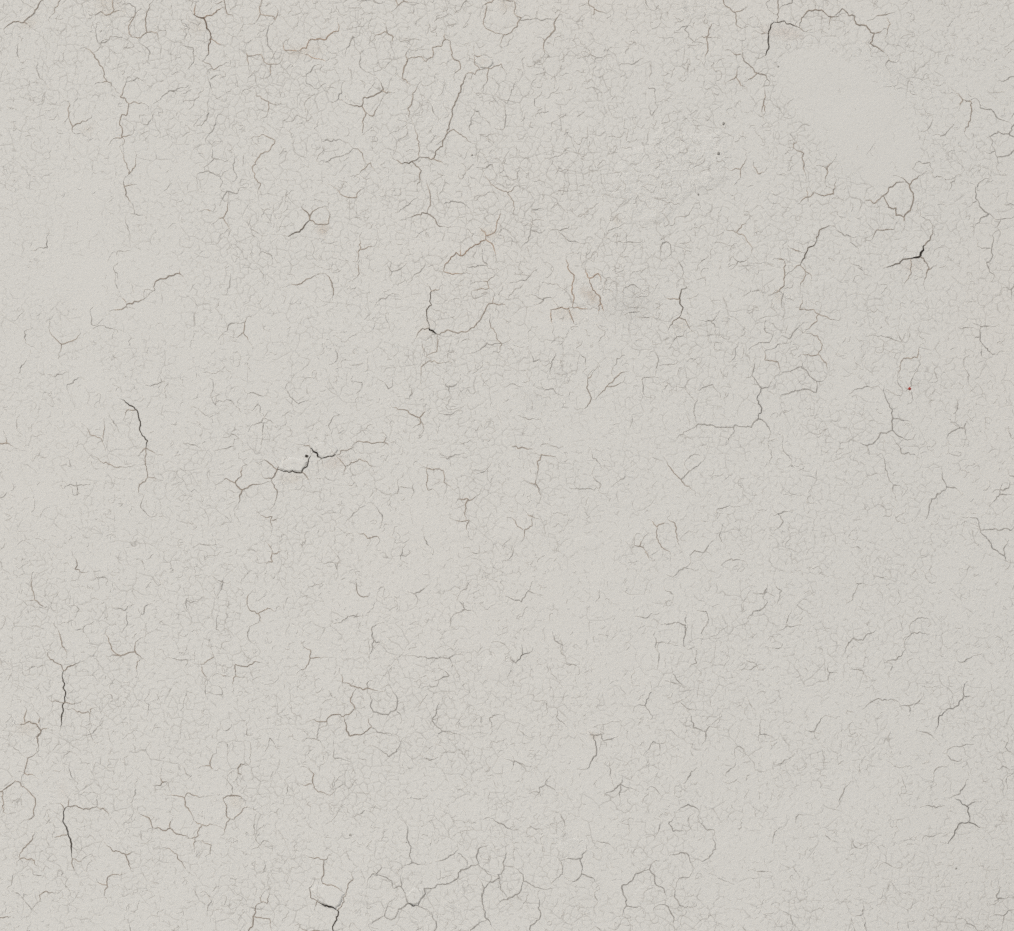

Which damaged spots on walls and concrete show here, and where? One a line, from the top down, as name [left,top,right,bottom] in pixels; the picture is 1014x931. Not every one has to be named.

crack [718,746,842,817]
crack [832,860,1009,931]